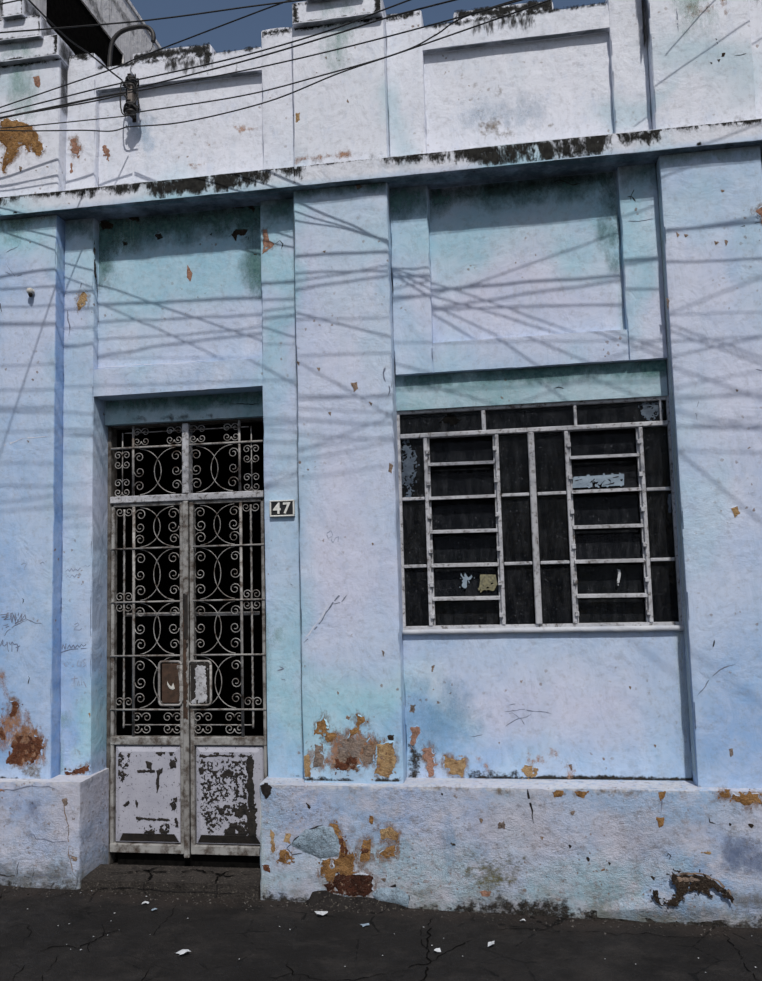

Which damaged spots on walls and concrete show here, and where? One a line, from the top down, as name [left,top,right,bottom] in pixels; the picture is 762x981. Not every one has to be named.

damp [0,0,94,114]
damp [97,0,420,88]
damp [425,0,606,51]
spalling [0,118,47,173]
damp [0,119,762,288]
spalling [0,697,45,767]
peeling [118,752,177,793]
peeling [198,752,265,836]
spalling [304,710,398,780]
spalling [409,725,468,778]
spalling [316,815,401,897]
spalling [650,869,734,909]